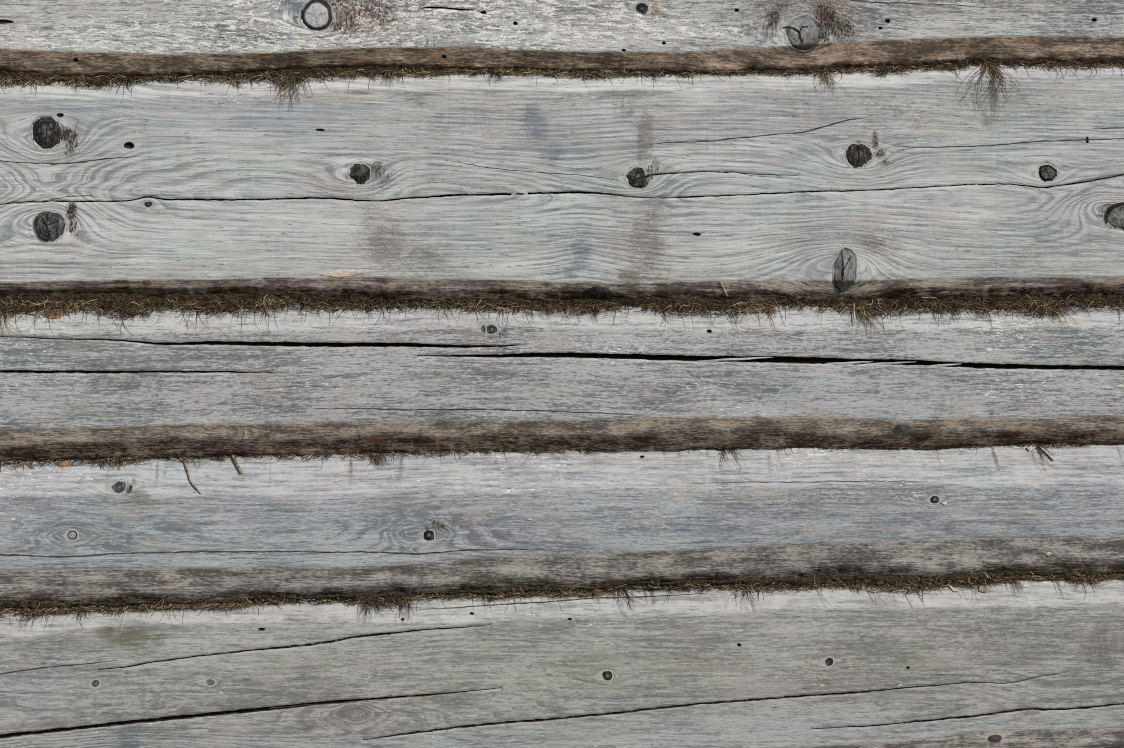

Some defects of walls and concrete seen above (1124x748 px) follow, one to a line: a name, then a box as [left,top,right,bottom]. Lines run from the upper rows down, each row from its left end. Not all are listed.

crack [0,117,1124,209]
crack [0,333,1124,377]
crack [0,593,706,675]
crack [0,668,1124,744]